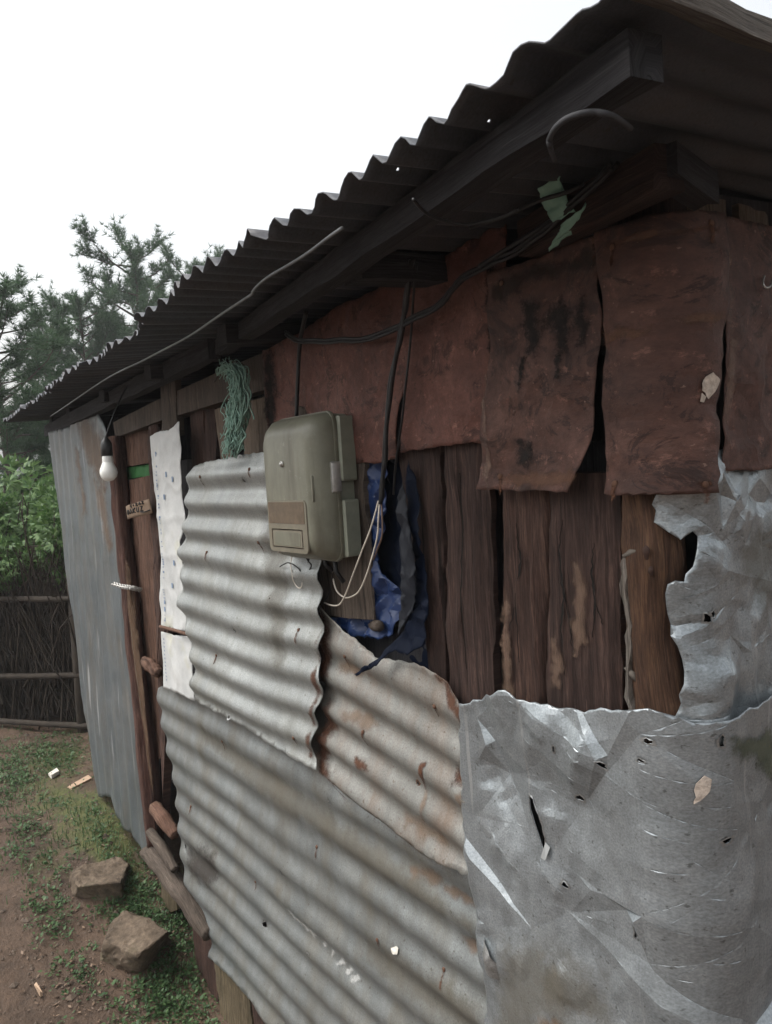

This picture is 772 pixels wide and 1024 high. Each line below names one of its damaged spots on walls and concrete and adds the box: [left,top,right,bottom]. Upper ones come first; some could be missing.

corrosion [294,612,344,797]
peeling [501,603,514,694]
peeling [551,641,562,688]
peeling [572,565,586,656]
peeling [694,776,712,804]